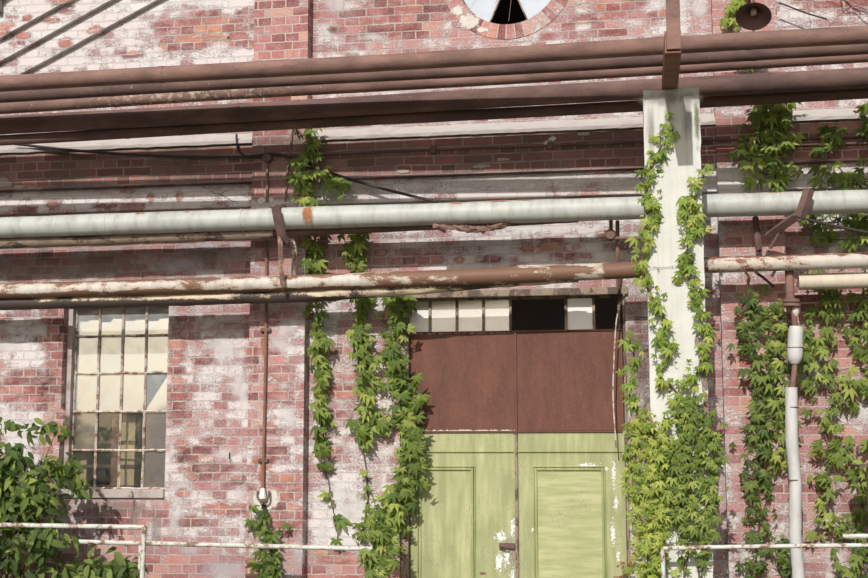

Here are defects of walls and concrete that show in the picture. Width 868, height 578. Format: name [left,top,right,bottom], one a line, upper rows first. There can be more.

peeling [0,0,73,44]
peeling [122,50,144,59]
peeling [151,10,254,52]
peeling [167,316,213,428]
peeling [244,343,258,368]
peeling [175,437,305,537]
peeling [578,457,620,561]
peeling [493,518,515,578]